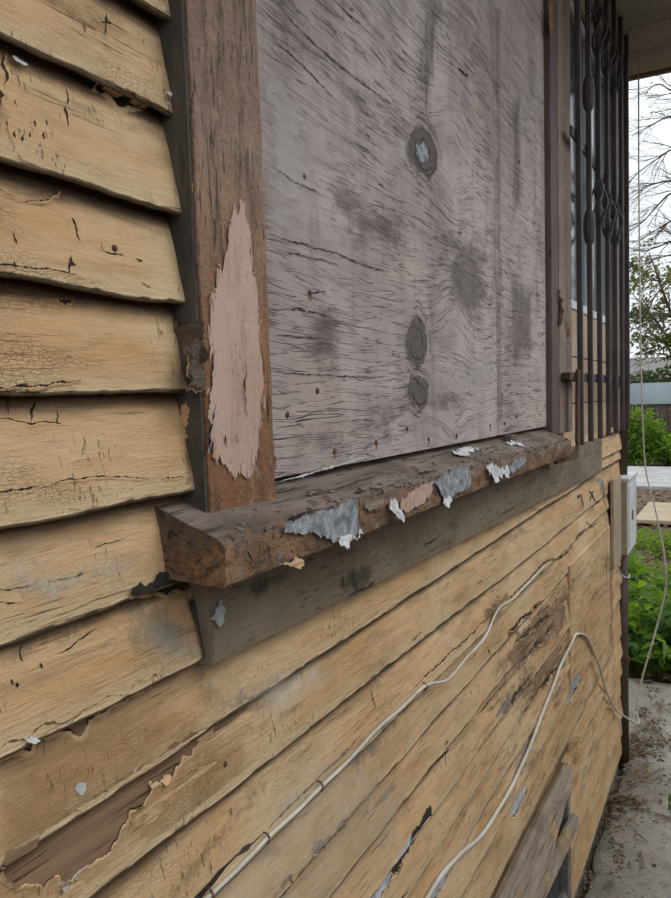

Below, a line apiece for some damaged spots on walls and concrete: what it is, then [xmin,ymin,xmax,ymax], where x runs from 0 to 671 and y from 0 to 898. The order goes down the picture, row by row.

peeling [0,84,48,141]
crack [0,189,62,206]
crack [0,218,151,288]
peeling [172,193,266,480]
crack [0,475,185,496]
peeling [284,465,472,550]
peeling [487,457,527,483]
crack [476,483,608,721]
crack [429,741,451,769]
peeling [0,721,218,893]
peeling [371,834,417,898]